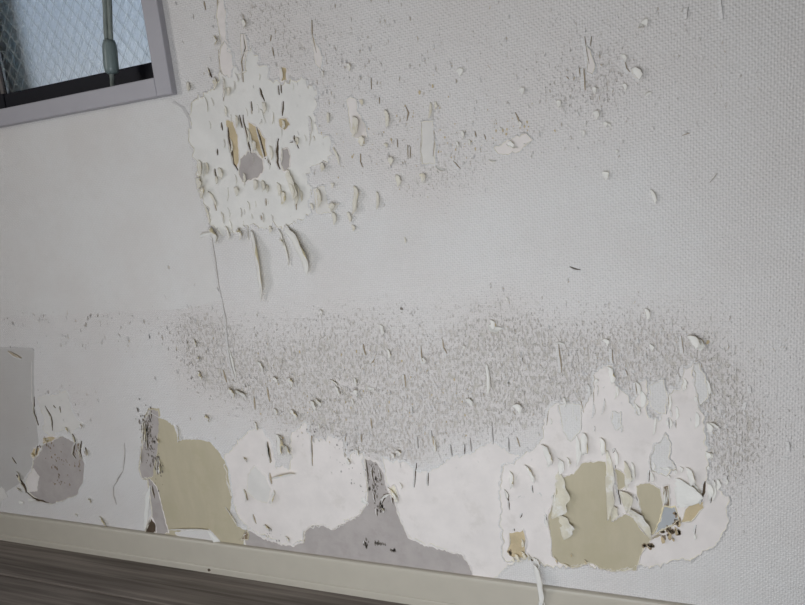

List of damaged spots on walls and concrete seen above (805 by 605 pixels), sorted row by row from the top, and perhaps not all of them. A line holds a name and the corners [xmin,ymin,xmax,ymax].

peeling [345,95,373,168]
peeling [377,97,534,183]
peeling [234,137,358,231]
peeling [221,365,321,462]
flaking render [16,427,88,504]
flaking render [143,479,168,534]
flaking render [245,460,472,575]
flaking render [506,528,533,562]